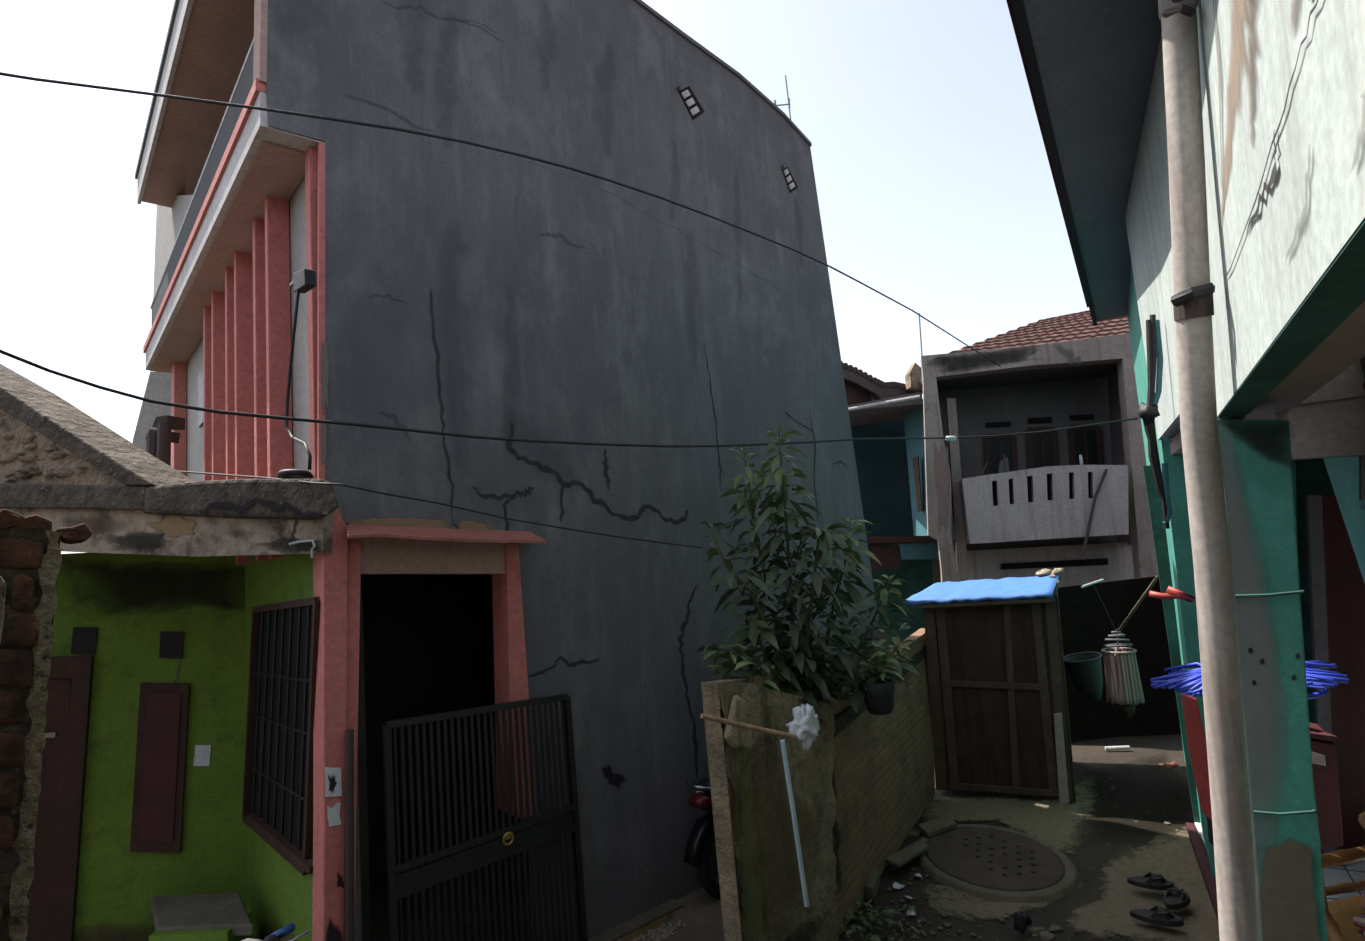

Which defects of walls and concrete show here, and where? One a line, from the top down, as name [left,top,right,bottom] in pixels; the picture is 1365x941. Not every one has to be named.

water stain [1221,0,1246,220]
water stain [1247,135,1277,232]
crack [430,291,743,531]
crack [528,657,599,677]
crack [677,586,698,776]